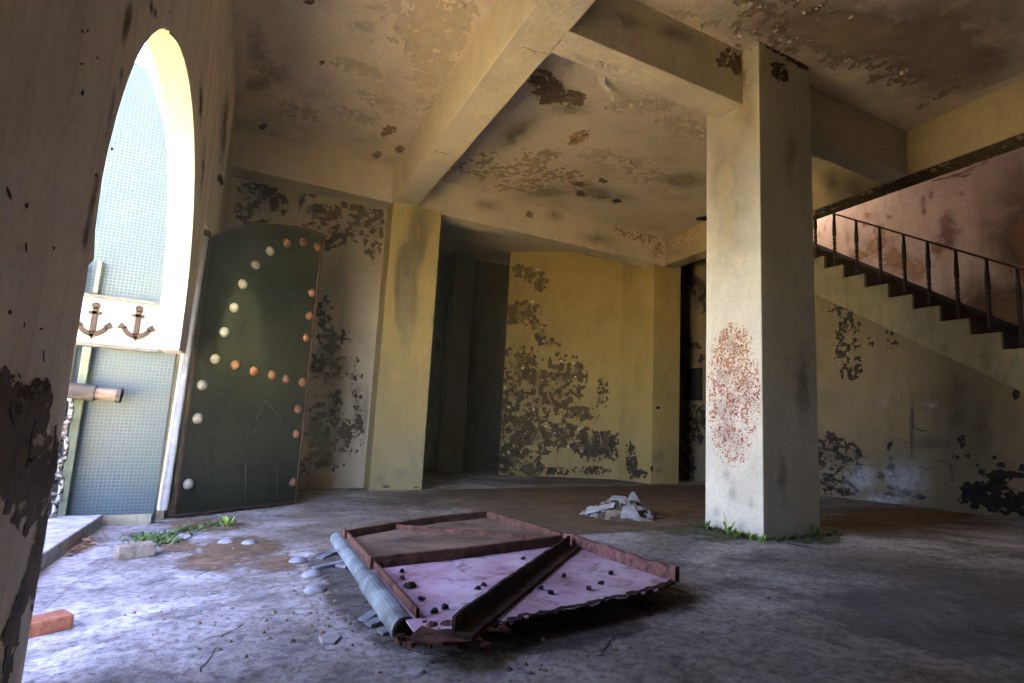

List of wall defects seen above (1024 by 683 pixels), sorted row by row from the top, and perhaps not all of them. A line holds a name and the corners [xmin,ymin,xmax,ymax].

peeling [276,0,480,154]
flaking render [527,69,587,108]
peeling [665,0,919,87]
peeling [458,129,680,205]
flaking render [0,365,60,683]
peeling [301,295,364,474]
peeling [499,264,653,480]
corrosion [707,322,761,467]
peeling [828,302,874,381]
peeling [818,431,926,500]